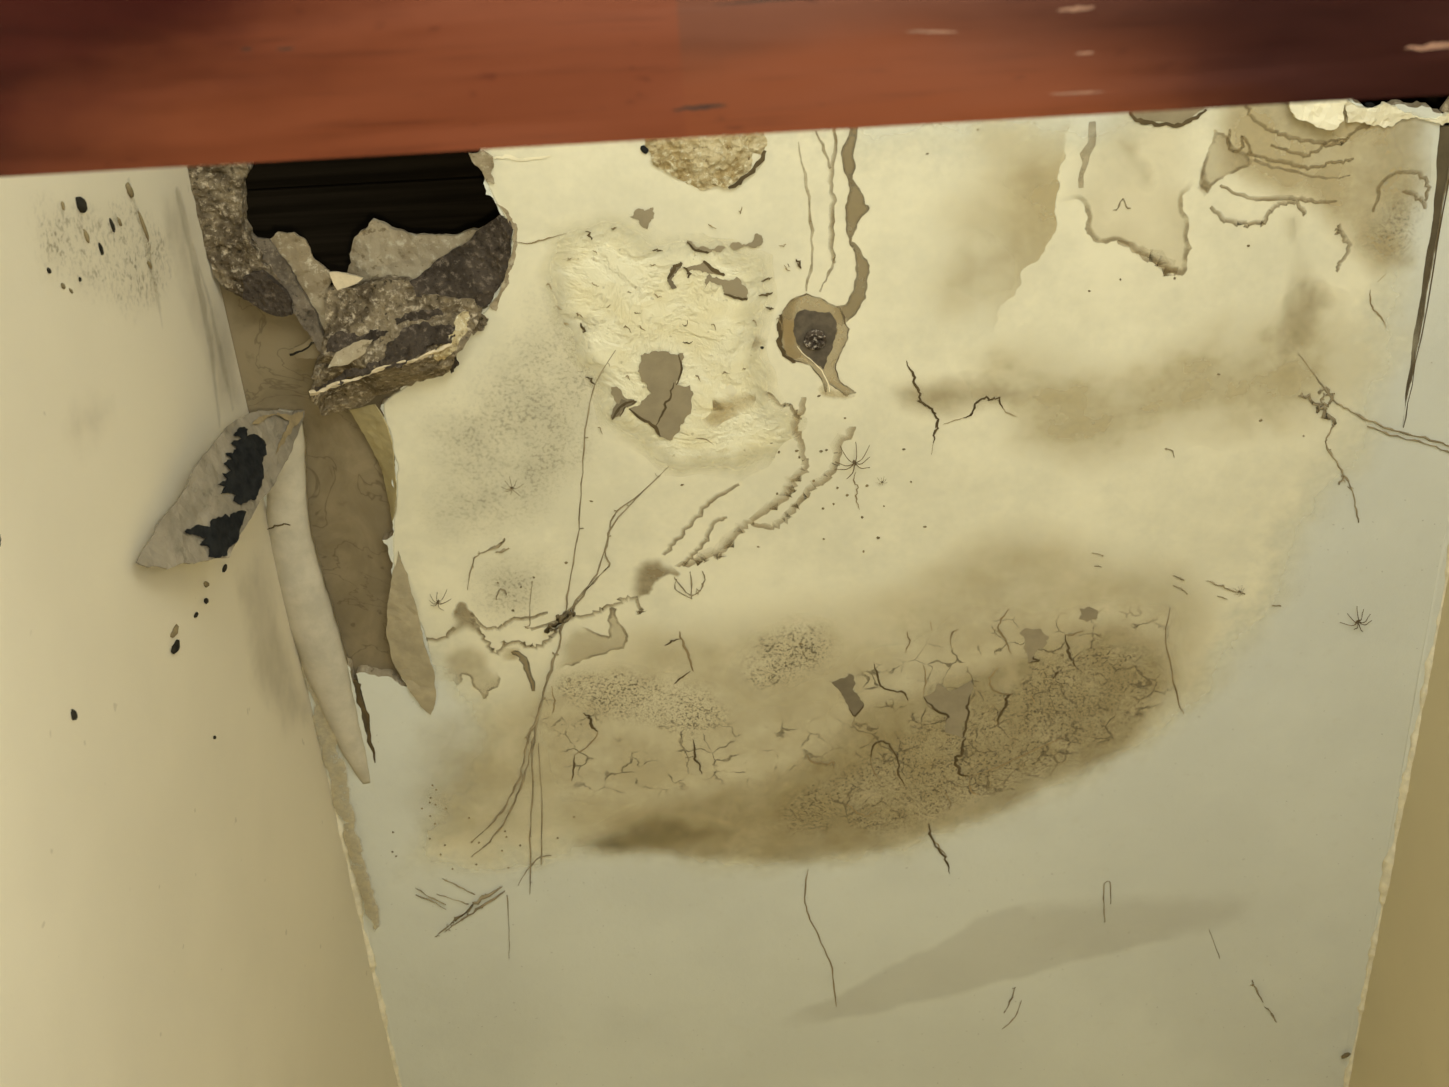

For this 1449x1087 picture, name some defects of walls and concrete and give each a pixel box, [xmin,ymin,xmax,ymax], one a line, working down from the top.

peeling [469,150,550,184]
flaking render [640,134,767,191]
crack [1369,125,1449,428]
peeling [136,163,518,715]
peeling [586,320,700,440]
water stain [384,105,1430,866]
crack [906,361,1014,455]
crack [666,631,694,684]
crack [873,609,1084,725]
crack [551,686,598,781]
crack [928,736,1065,873]
crack [804,869,837,1007]